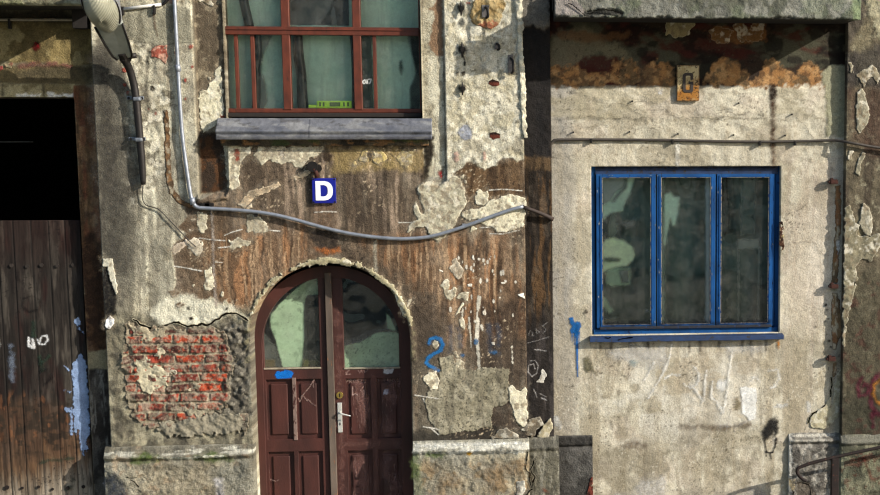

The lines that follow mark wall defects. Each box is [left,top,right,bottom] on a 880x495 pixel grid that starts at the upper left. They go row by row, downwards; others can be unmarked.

flaking render [665,23,695,38]
flaking render [708,23,765,44]
flaking render [197,66,224,133]
flaking render [848,62,880,133]
flaking render [353,149,416,168]
flaking render [848,151,865,176]
flaking render [223,146,324,250]
flaking render [407,175,527,241]
flaking render [439,258,472,329]
flaking render [102,258,249,438]
flaking render [423,340,553,439]
crack [524,452,536,495]